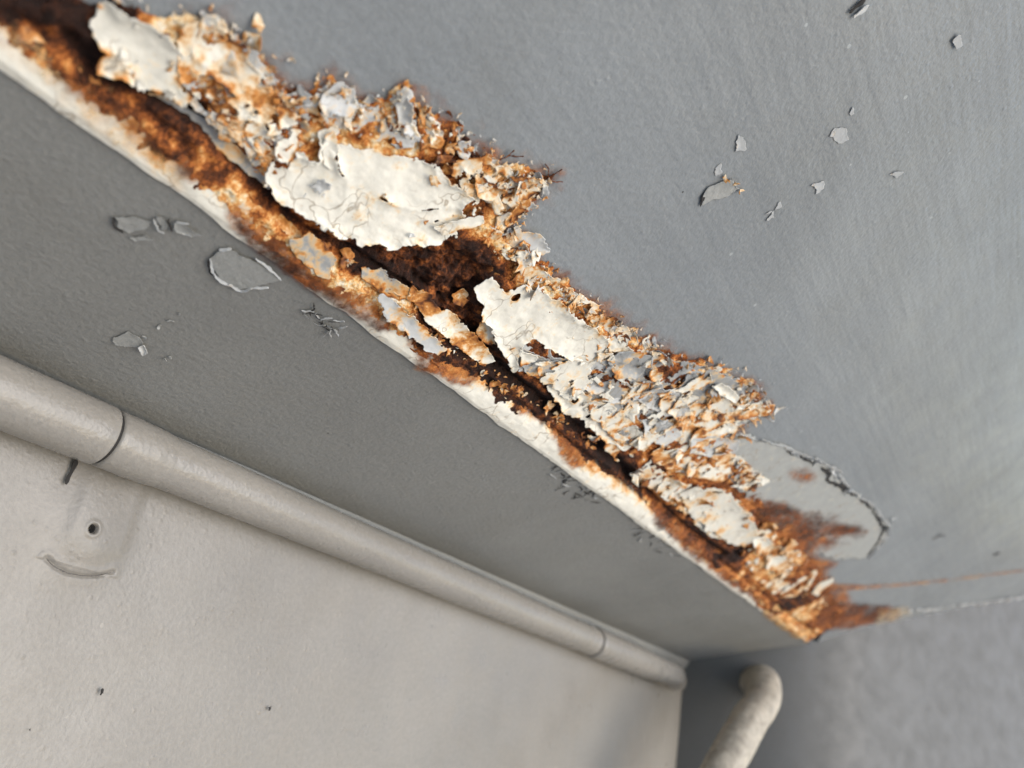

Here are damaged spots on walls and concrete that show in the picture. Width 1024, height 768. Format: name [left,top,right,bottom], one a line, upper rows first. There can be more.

rust [0,0,900,643]
peeling [89,0,897,598]